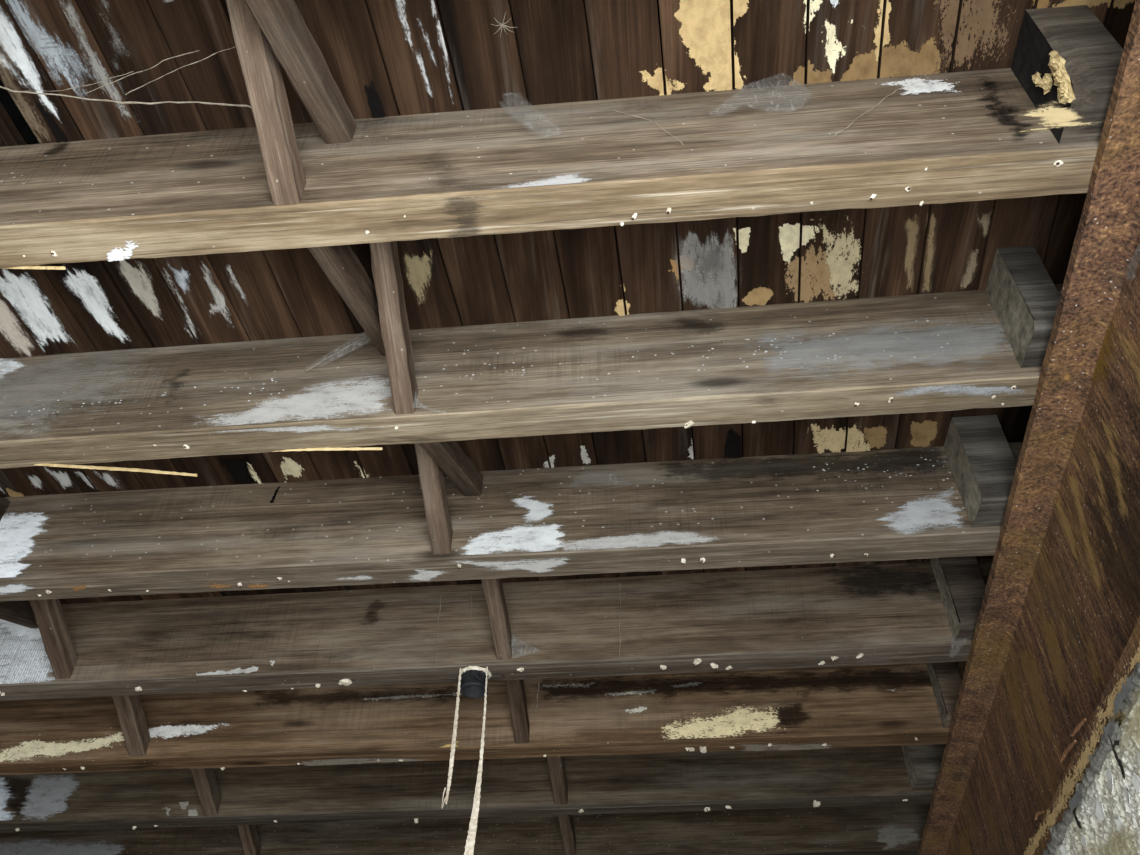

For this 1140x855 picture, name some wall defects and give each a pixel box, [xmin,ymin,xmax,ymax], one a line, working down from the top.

peeling [840,36,942,81]